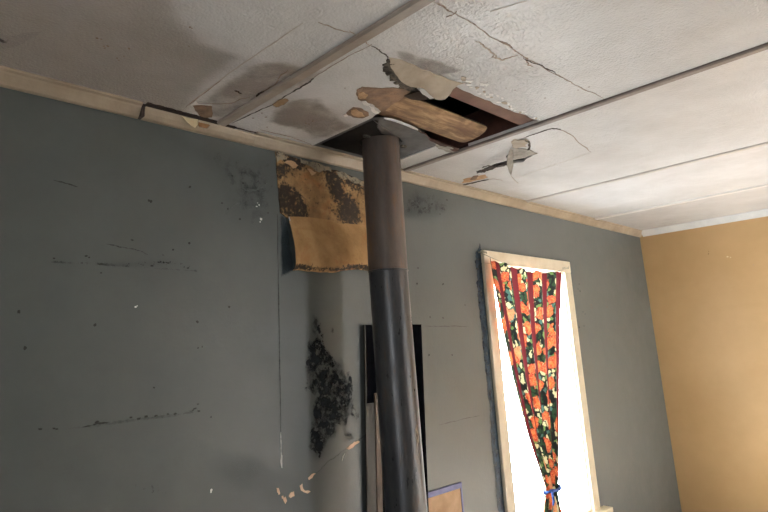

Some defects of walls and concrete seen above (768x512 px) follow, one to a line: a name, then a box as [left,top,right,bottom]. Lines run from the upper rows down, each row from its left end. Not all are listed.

crack [435,2,602,98]
leakage [305,319,359,458]
peeling [277,435,365,504]